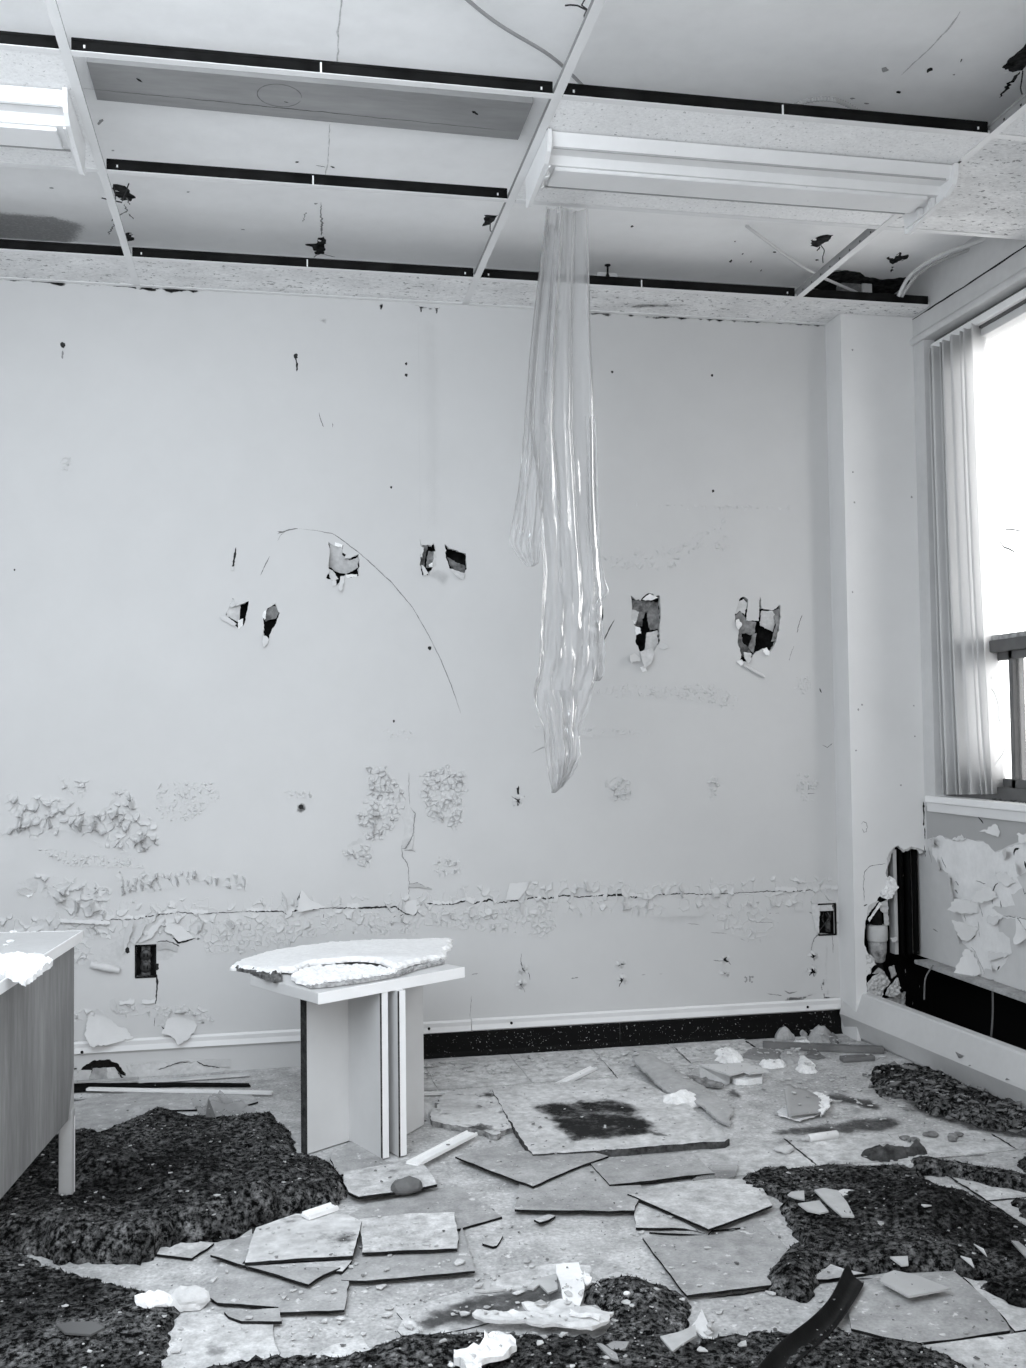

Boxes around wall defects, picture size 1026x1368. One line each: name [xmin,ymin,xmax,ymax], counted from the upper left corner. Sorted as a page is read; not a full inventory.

spalling [999,42,1026,98]
spalling [326,542,360,591]
spalling [220,599,279,647]
spalling [630,593,669,672]
spalling [735,597,780,678]
peeling [340,762,469,869]
peeling [0,774,250,973]
peeling [864,806,1026,1017]
peeling [291,963,397,986]